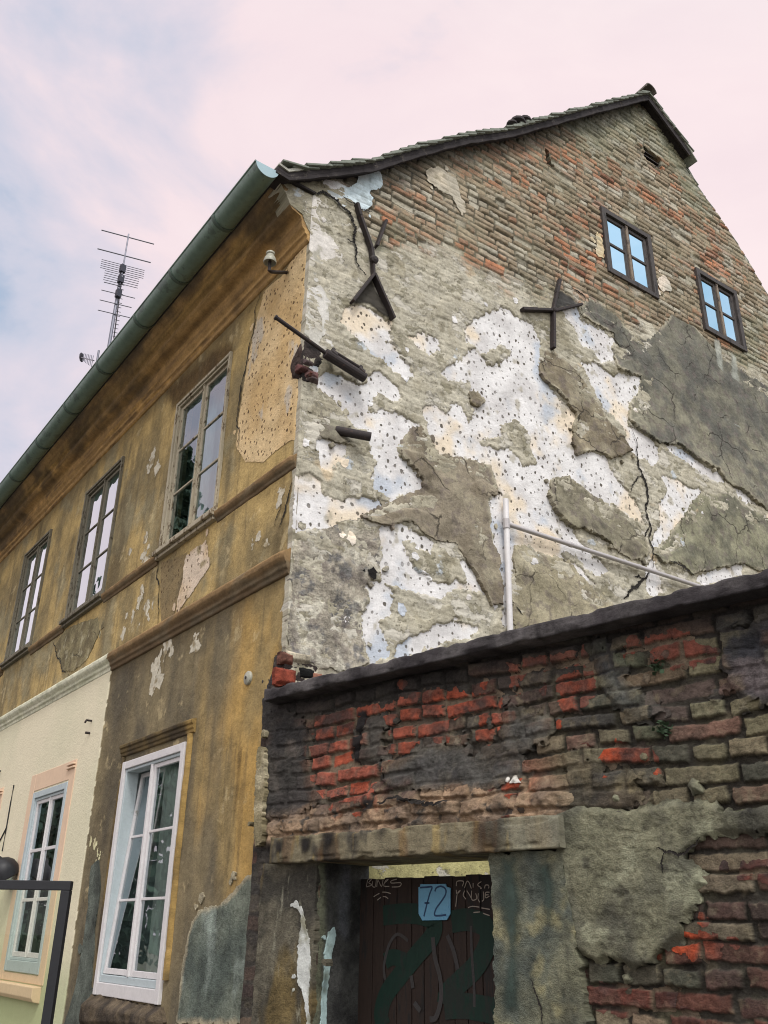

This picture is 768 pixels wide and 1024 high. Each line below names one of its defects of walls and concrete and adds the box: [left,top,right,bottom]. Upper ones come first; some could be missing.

crack [302,188,372,275]
spalling [233,245,768,689]
crack [624,430,694,599]
spalling [172,528,210,612]
peeling [149,639,174,696]
peeling [190,632,201,653]
spalling [309,644,597,818]
spalling [581,738,664,778]
spalling [719,859,768,885]
peeling [290,900,336,1024]
spalling [587,974,701,1024]
spalling [671,912,743,964]